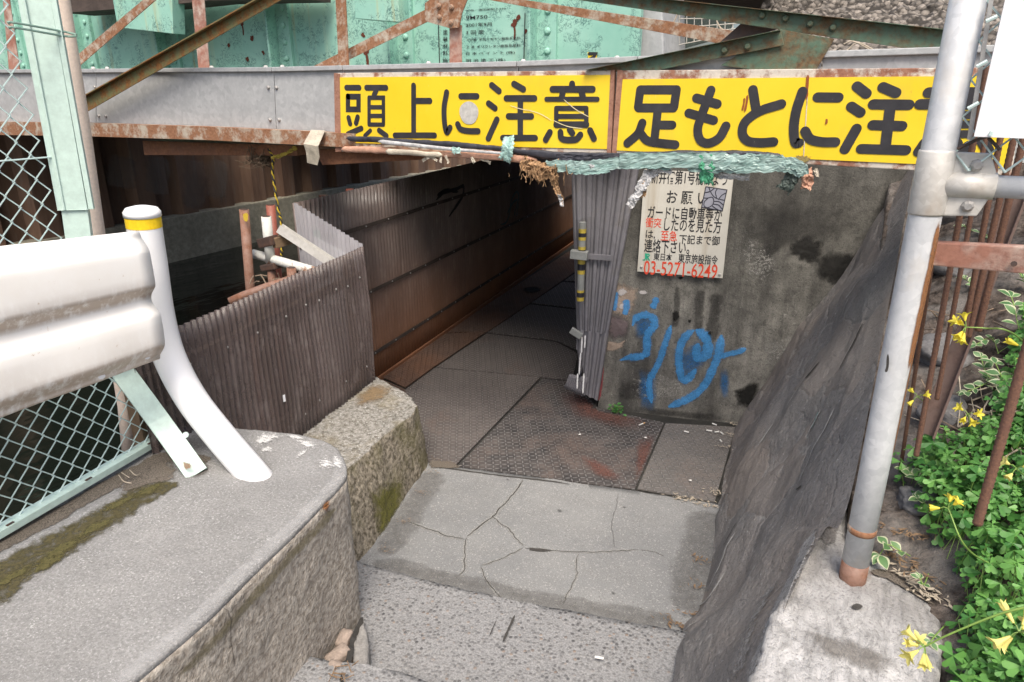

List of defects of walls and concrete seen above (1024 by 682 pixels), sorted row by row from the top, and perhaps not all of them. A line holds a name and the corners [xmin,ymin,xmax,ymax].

leakage [746,214,854,283]
crack [411,482,524,597]
crack [551,505,659,600]